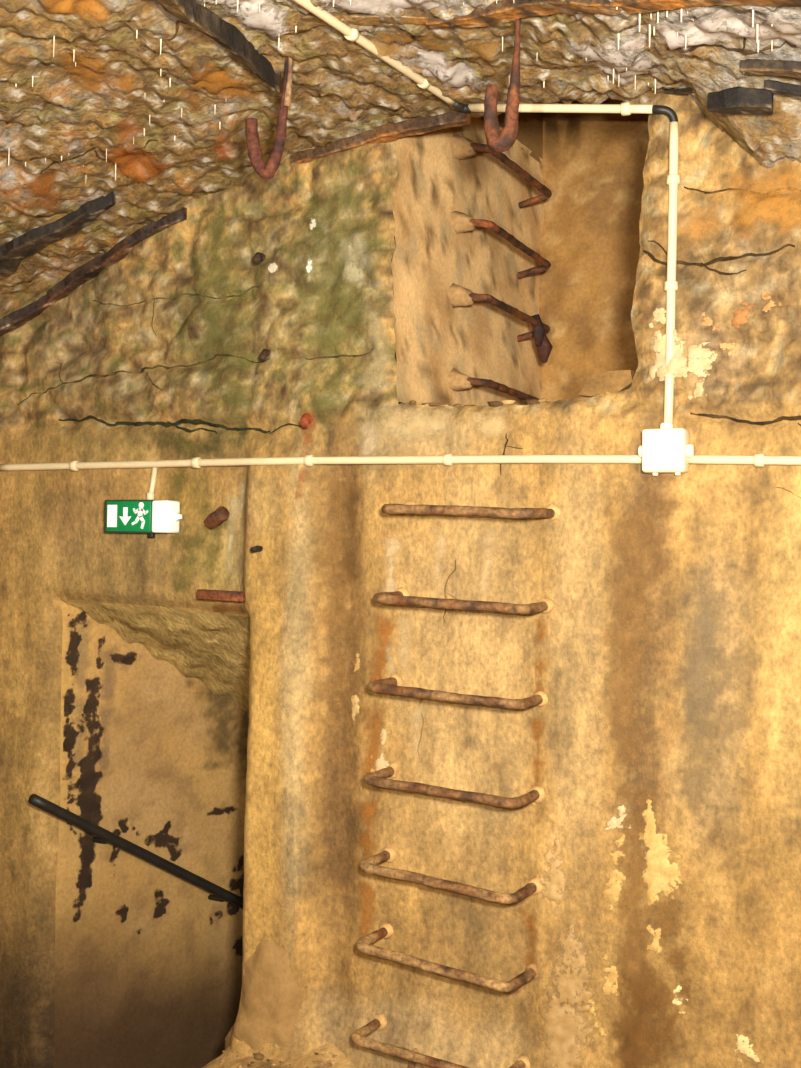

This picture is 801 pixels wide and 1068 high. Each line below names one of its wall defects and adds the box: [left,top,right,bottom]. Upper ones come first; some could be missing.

efflorescence [202,0,290,38]
efflorescence [323,0,440,15]
efflorescence [652,9,801,50]
efflorescence [399,40,494,90]
efflorescence [568,38,658,85]
crack [684,186,801,194]
efflorescence [344,242,367,281]
crack [643,240,795,275]
crack [58,415,300,434]
crack [690,412,801,426]
water stain [684,585,722,760]
water stain [618,791,687,1068]